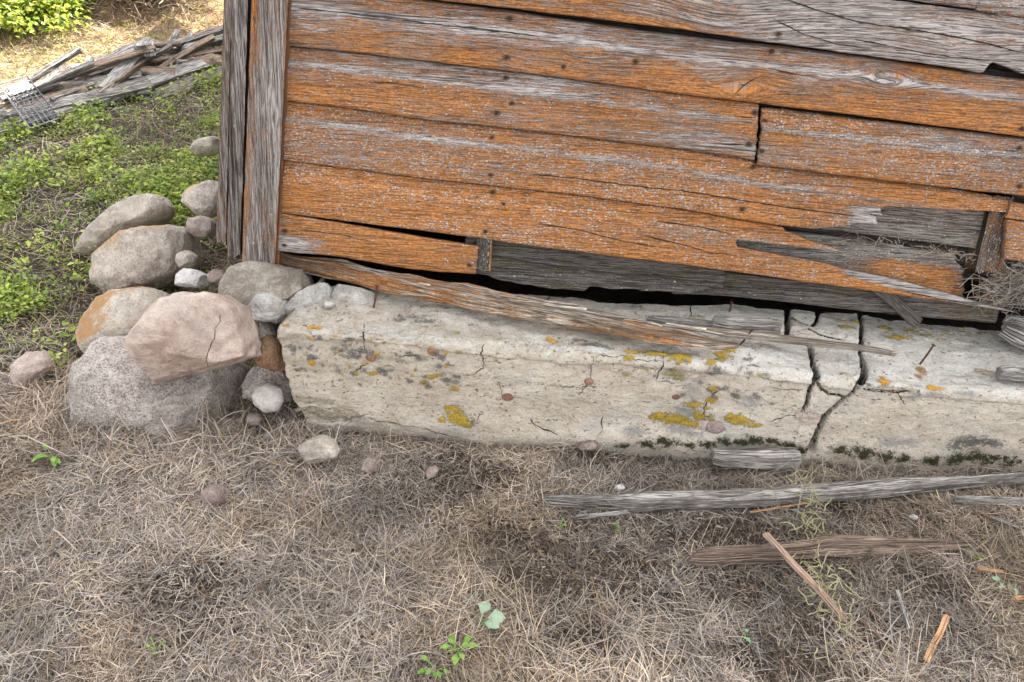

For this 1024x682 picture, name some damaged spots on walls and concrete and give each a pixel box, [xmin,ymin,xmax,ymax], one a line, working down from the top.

crack [771,312,908,442]